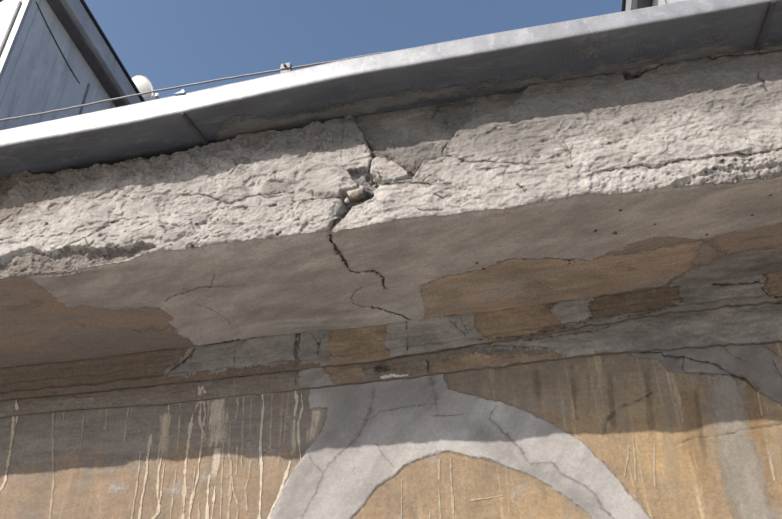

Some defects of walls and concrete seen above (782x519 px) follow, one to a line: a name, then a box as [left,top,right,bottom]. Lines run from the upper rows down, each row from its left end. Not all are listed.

spalling [346,167,376,201]
crack [604,148,782,171]
crack [70,216,143,247]
crack [190,192,410,350]
leakage [0,399,19,491]
leakage [131,380,321,519]